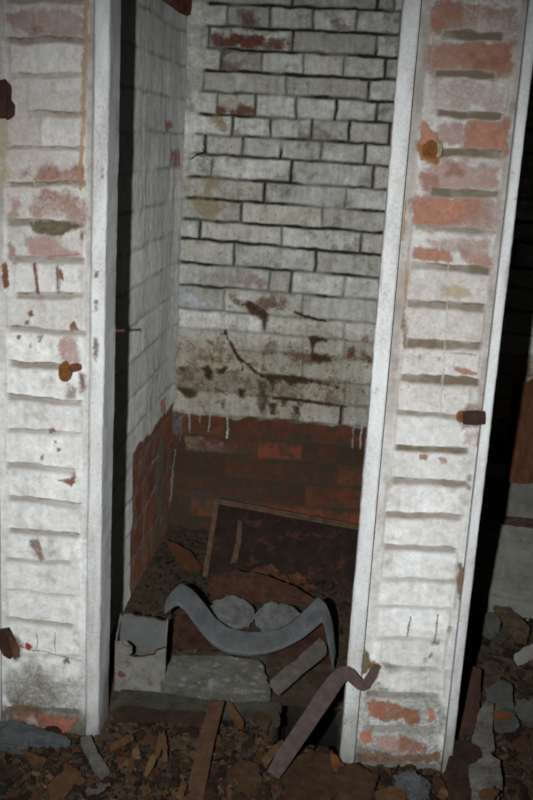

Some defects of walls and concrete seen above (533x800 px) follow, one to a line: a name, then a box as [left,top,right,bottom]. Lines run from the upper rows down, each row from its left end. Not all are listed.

peeling [431,0,510,34]
peeling [427,41,513,77]
peeling [420,118,510,156]
peeling [410,159,499,227]
peeling [25,190,85,258]
peeling [413,240,491,266]
crack [223,330,263,377]
flaking render [367,699,434,725]
flaking render [359,731,440,762]